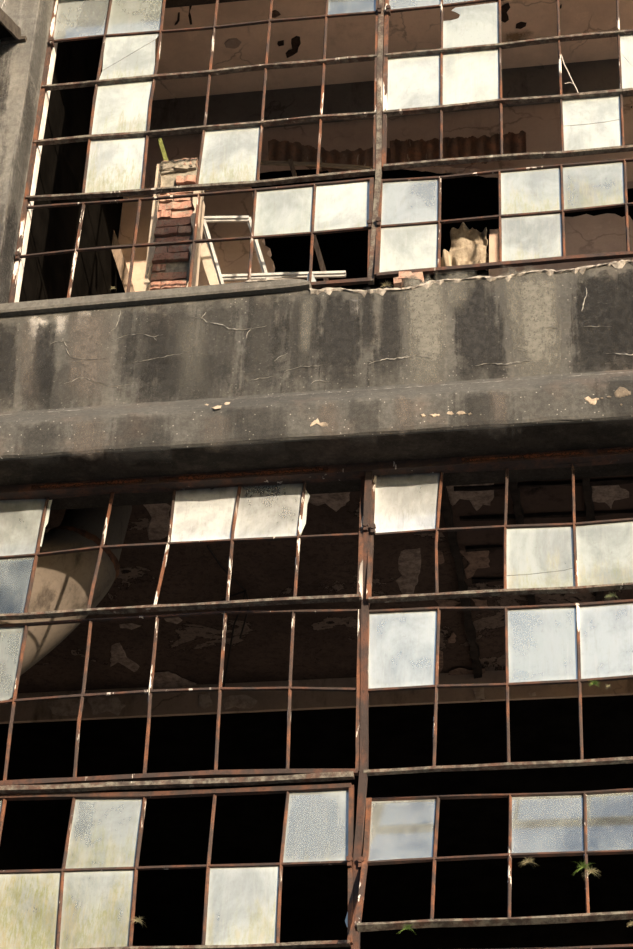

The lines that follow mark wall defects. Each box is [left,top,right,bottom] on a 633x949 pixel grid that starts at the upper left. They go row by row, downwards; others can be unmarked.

water stain [0,204,17,304]
water stain [0,311,109,397]
crack [189,314,265,338]
water stain [286,269,560,384]
spalling [309,260,633,297]
water stain [571,270,633,370]
spalling [585,387,631,406]